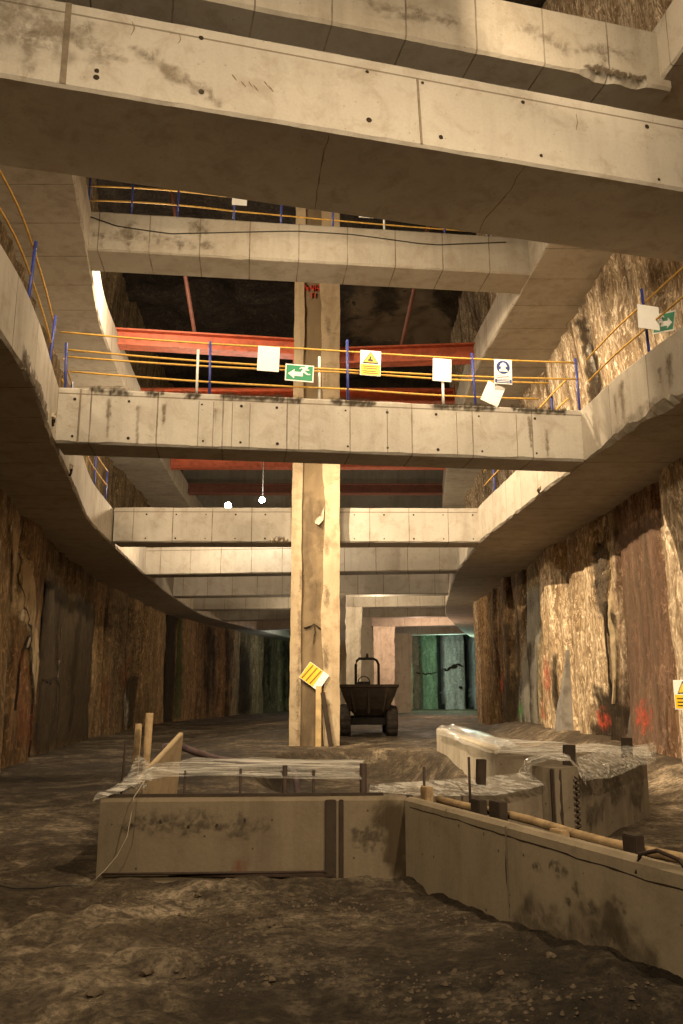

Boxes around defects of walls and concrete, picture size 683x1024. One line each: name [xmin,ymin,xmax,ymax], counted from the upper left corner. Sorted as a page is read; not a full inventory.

spalling [585,64,646,80]
crack [416,663,463,689]